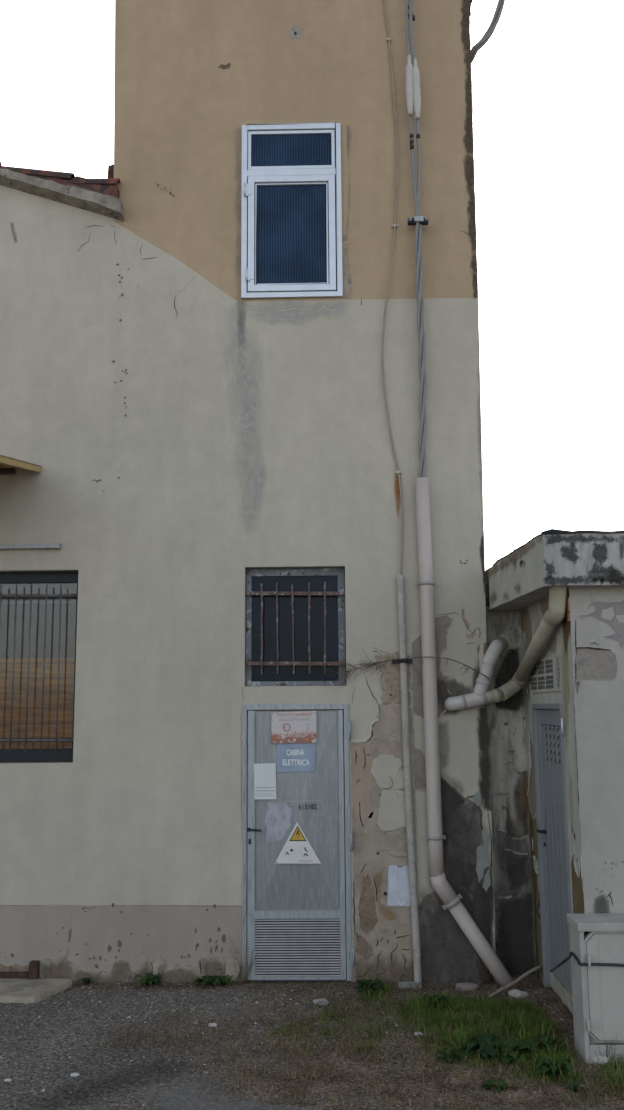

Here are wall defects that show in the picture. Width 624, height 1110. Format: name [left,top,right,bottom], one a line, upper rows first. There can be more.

damp [480,531,538,603]
flaking render [435,608,487,720]
peeling [521,597,549,651]
flaking render [550,590,624,693]
flaking render [351,633,426,982]
damp [437,649,536,975]
peeling [527,732,543,984]
peeling [570,824,617,914]
spalling [0,906,243,983]
damp [418,890,493,982]